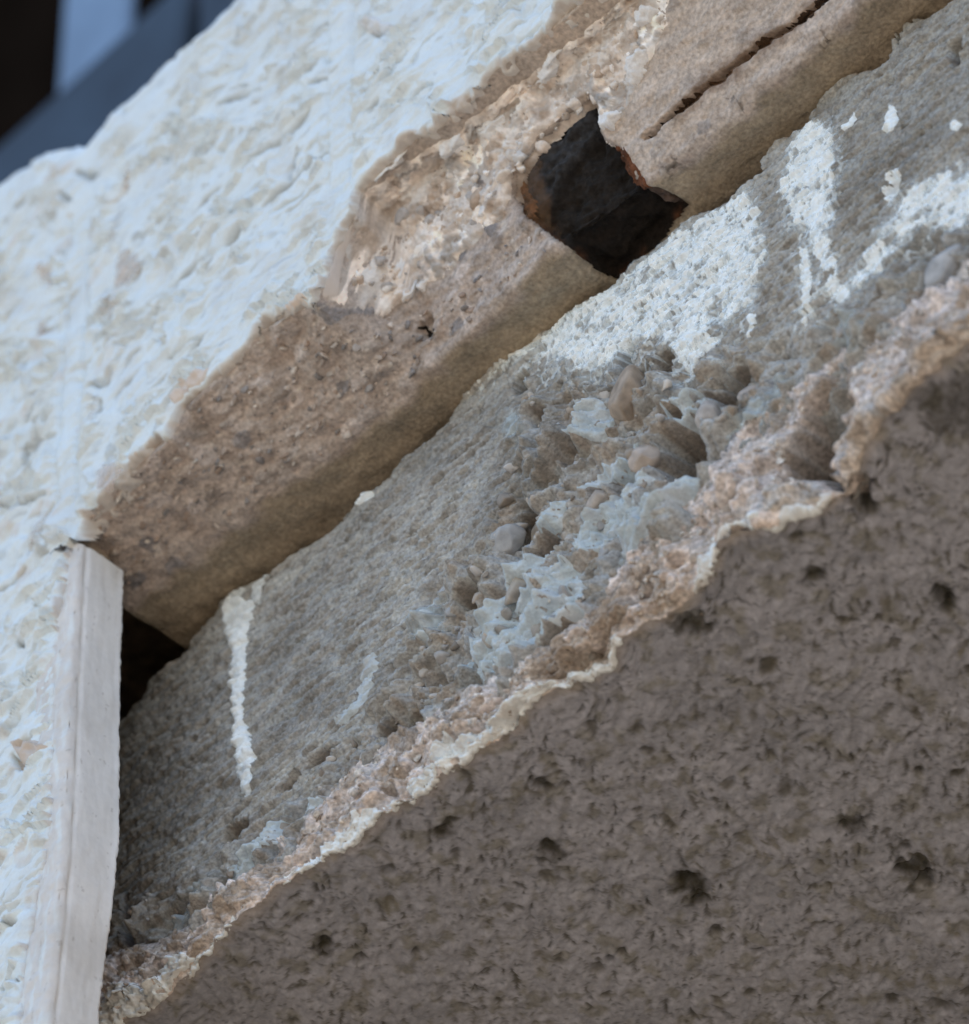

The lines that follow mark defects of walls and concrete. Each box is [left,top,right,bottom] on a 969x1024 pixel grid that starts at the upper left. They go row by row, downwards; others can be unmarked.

crack [649,0,829,138]
spalling [322,0,669,317]
rust [520,179,539,219]
rust [616,146,684,203]
damp [776,112,969,332]
damp [228,574,269,604]
spalling [98,260,969,1024]
damp [236,763,252,797]